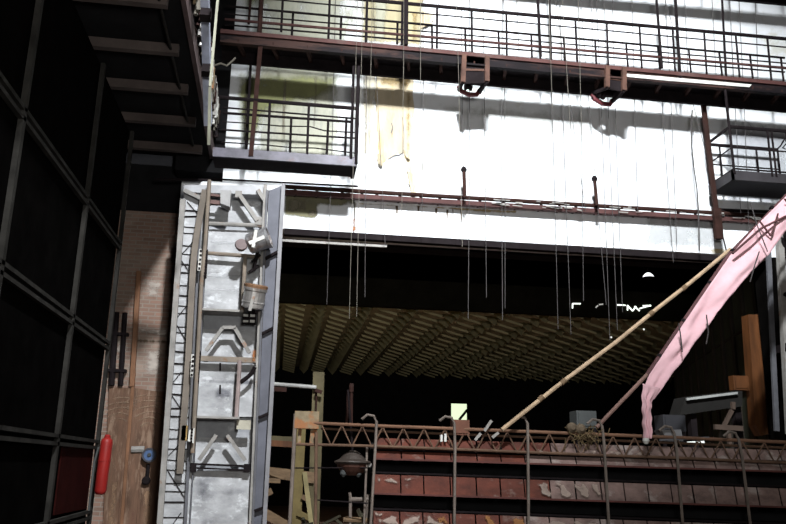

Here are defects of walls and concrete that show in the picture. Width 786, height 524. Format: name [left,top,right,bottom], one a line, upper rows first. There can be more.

peeling [374,77,417,193]
peeling [539,483,601,497]
peeling [375,513,443,524]